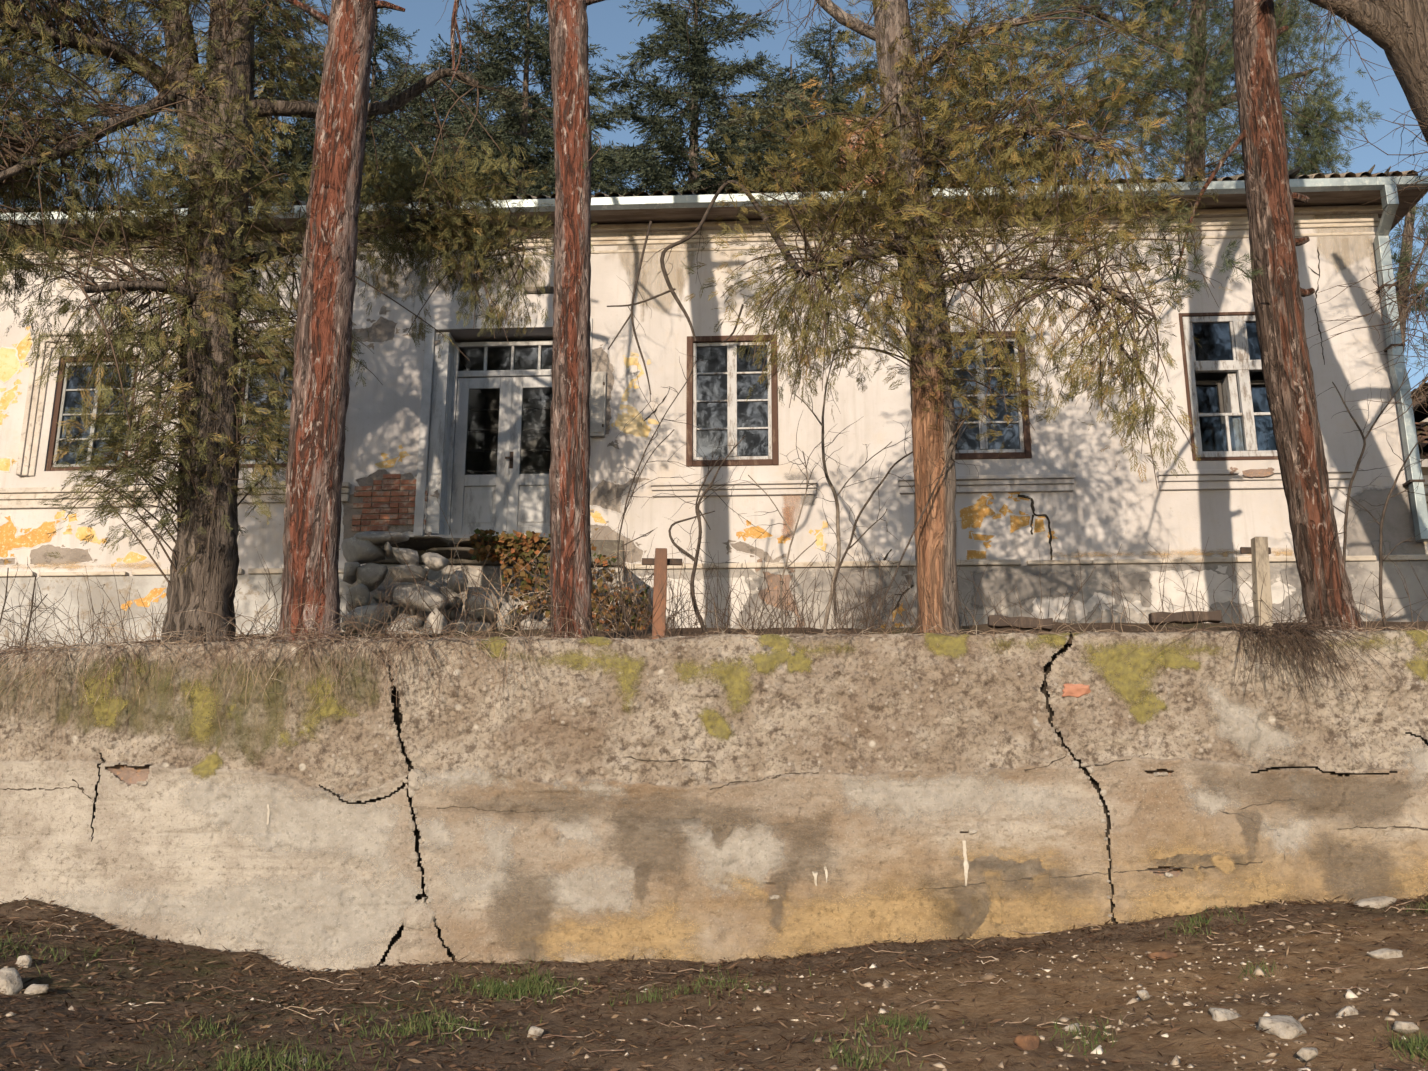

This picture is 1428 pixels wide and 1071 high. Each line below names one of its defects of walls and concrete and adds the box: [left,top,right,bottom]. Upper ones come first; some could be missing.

peeling [0,326,34,426]
peeling [590,344,659,449]
peeling [0,510,148,570]
spalling [339,444,440,550]
peeling [958,492,1058,560]
crack [1018,494,1053,560]
crack [3,753,106,842]
crack [320,660,567,966]
damp [448,783,1096,964]
crack [916,630,1395,924]
crack [1338,824,1428,832]
crack [1405,732,1428,746]